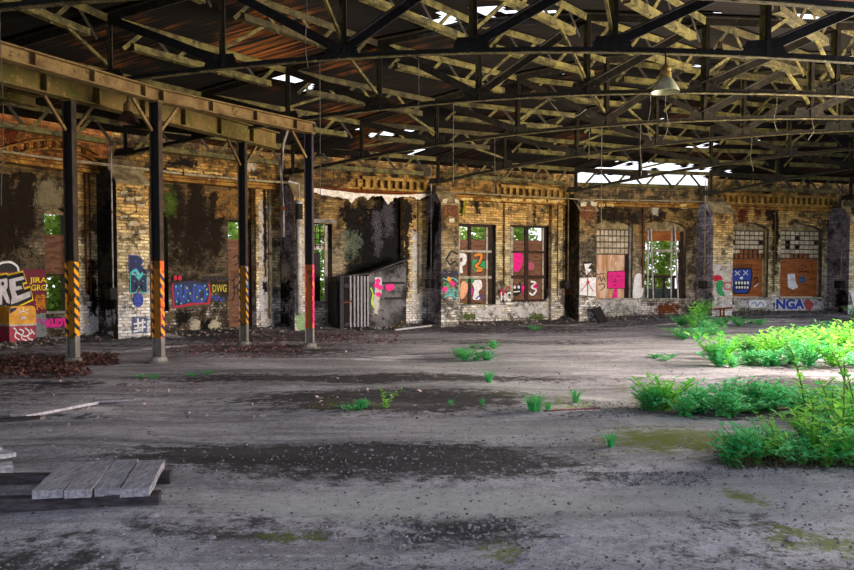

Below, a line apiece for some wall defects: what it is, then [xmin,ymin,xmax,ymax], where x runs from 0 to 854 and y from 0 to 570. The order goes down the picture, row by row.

water stain [0,171,38,262]
water stain [166,183,225,273]
peeling [216,188,273,327]
peeling [314,188,430,204]